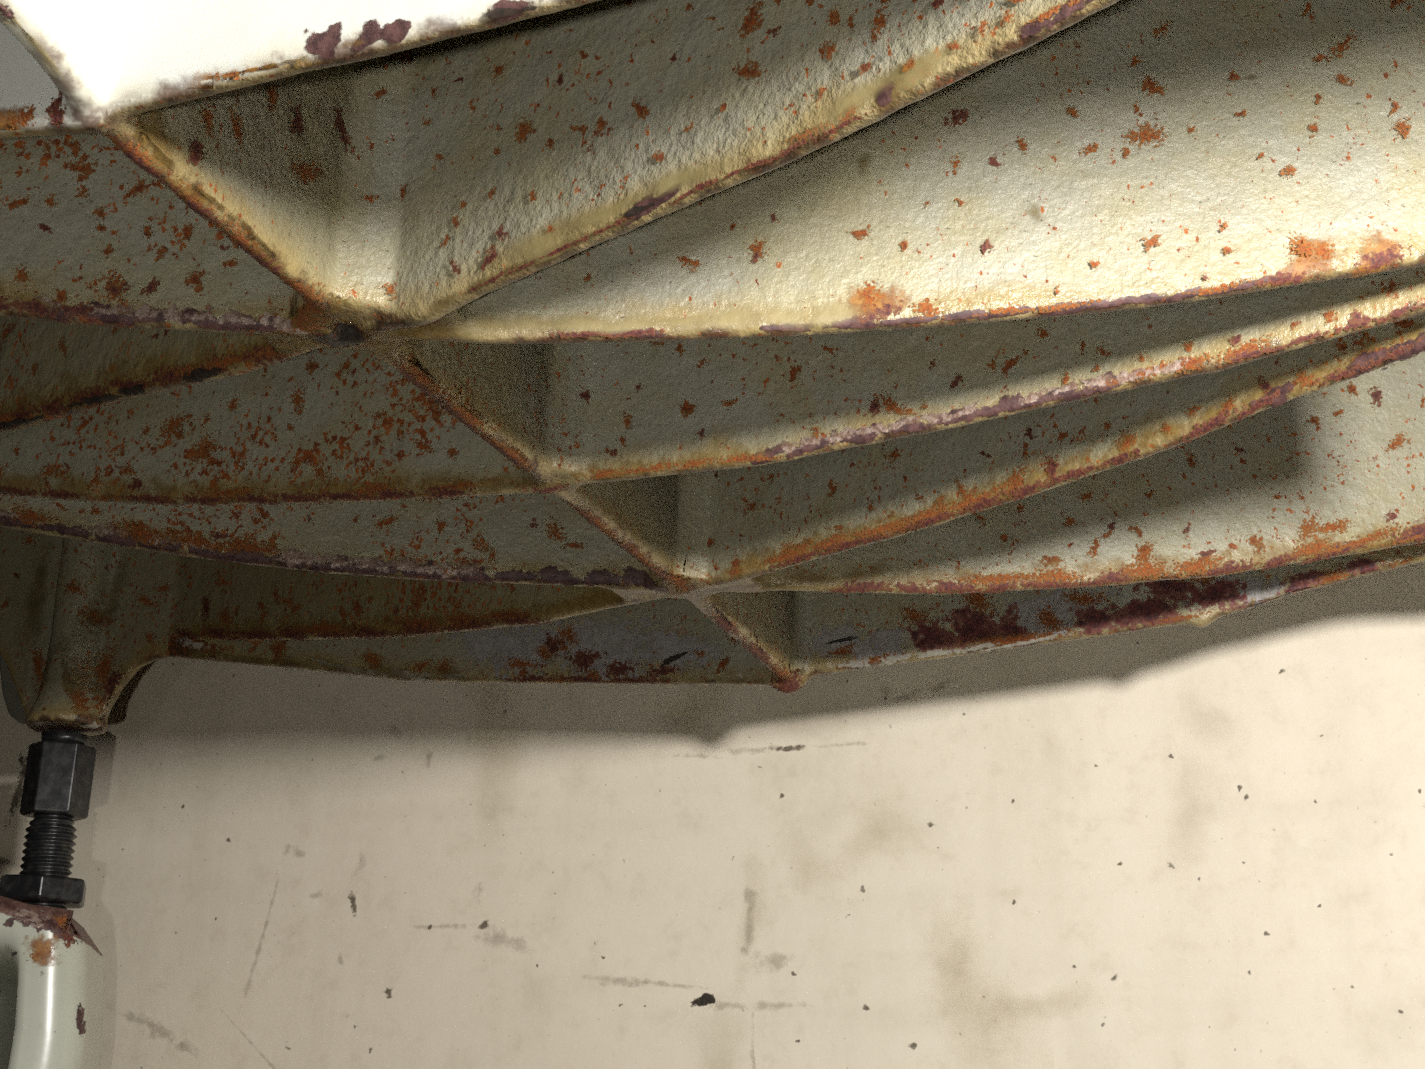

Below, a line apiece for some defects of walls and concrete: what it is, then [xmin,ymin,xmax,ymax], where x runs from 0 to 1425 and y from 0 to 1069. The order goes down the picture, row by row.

rust [651,0,962,206]
rust [1121,55,1197,158]
rust [1389,101,1412,138]
rust [0,64,482,549]
rust [421,199,635,328]
rust [474,231,1336,376]
rust [1079,232,1425,471]
rust [390,344,791,594]
rust [726,421,1142,579]
rust [145,581,553,681]
rust [494,644,675,683]
rust [823,509,1425,670]